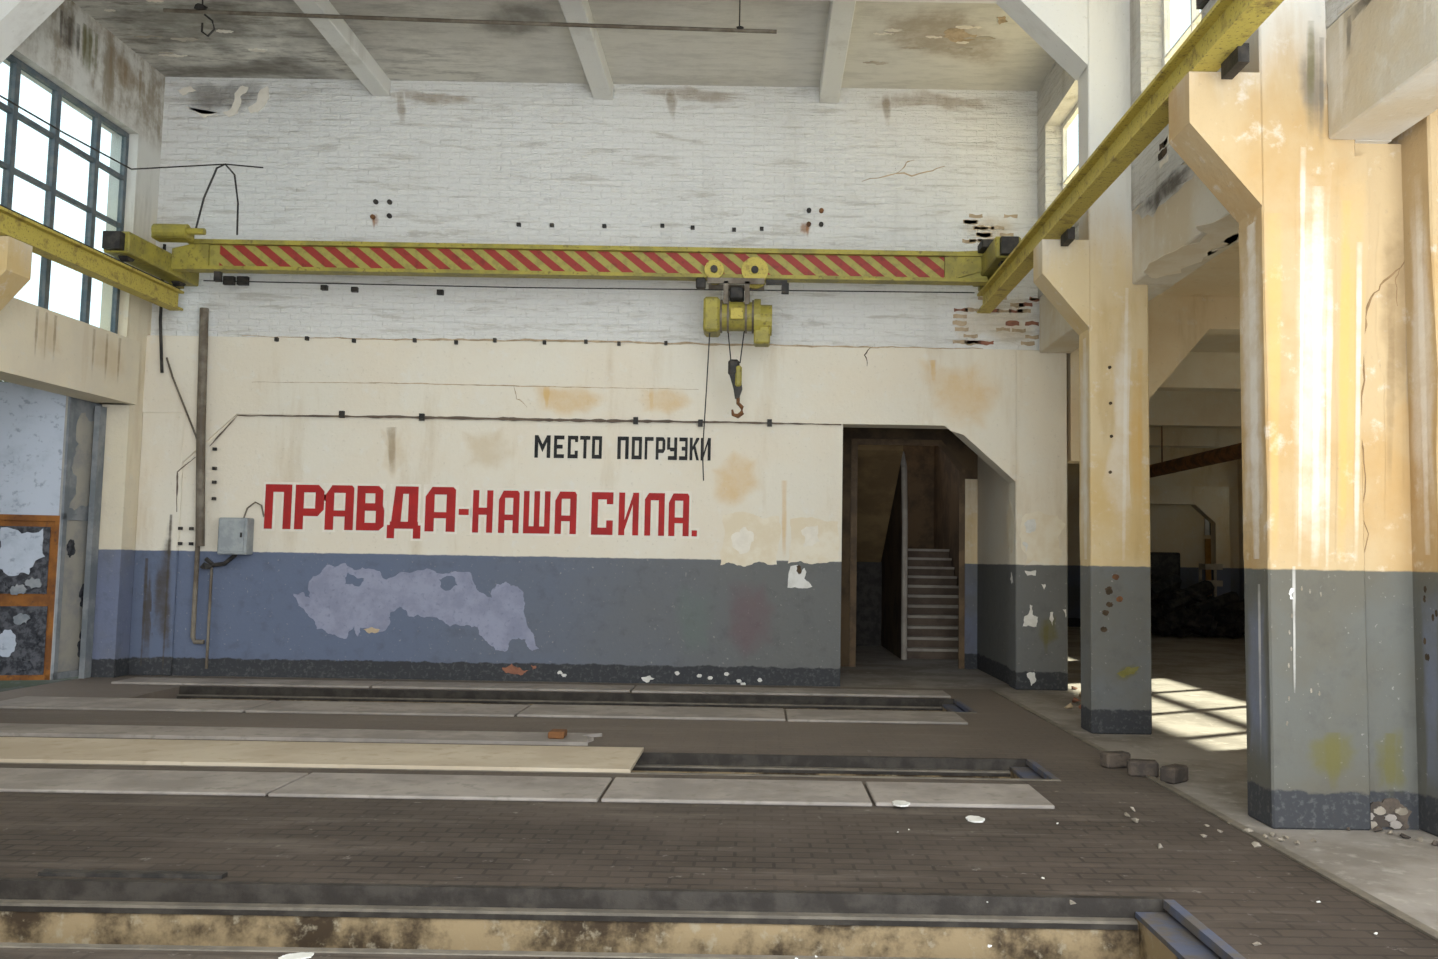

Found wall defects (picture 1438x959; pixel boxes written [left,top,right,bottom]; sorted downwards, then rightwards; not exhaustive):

leakage [58,0,353,106]
flaking render [948,292,1040,349]
crack [1361,262,1404,553]
peeling [720,512,840,588]
peeling [293,563,539,675]
peeling [1023,605,1067,627]
spalling [176,671,977,713]